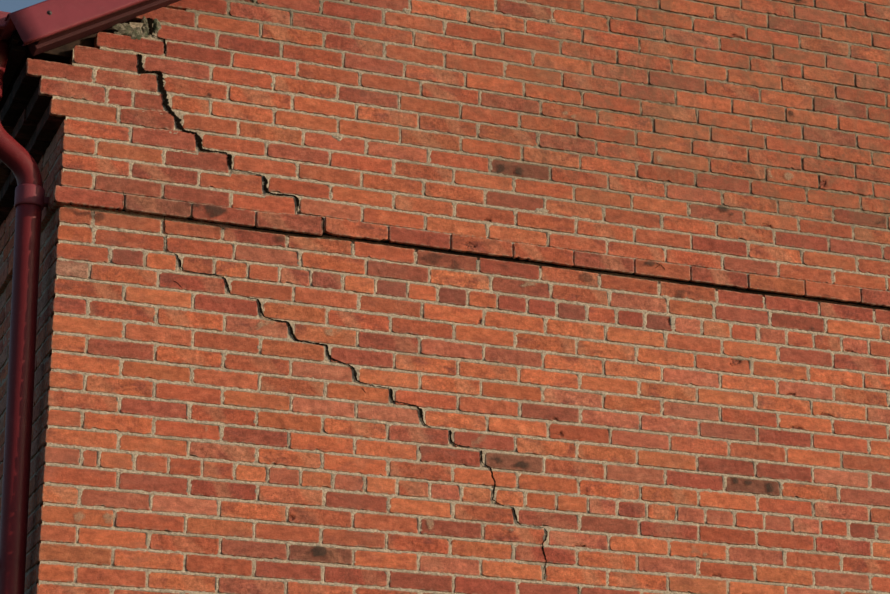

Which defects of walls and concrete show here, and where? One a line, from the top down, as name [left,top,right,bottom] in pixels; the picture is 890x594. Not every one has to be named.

crack [147,18,167,54]
crack [137,54,304,215]
crack [69,192,890,579]